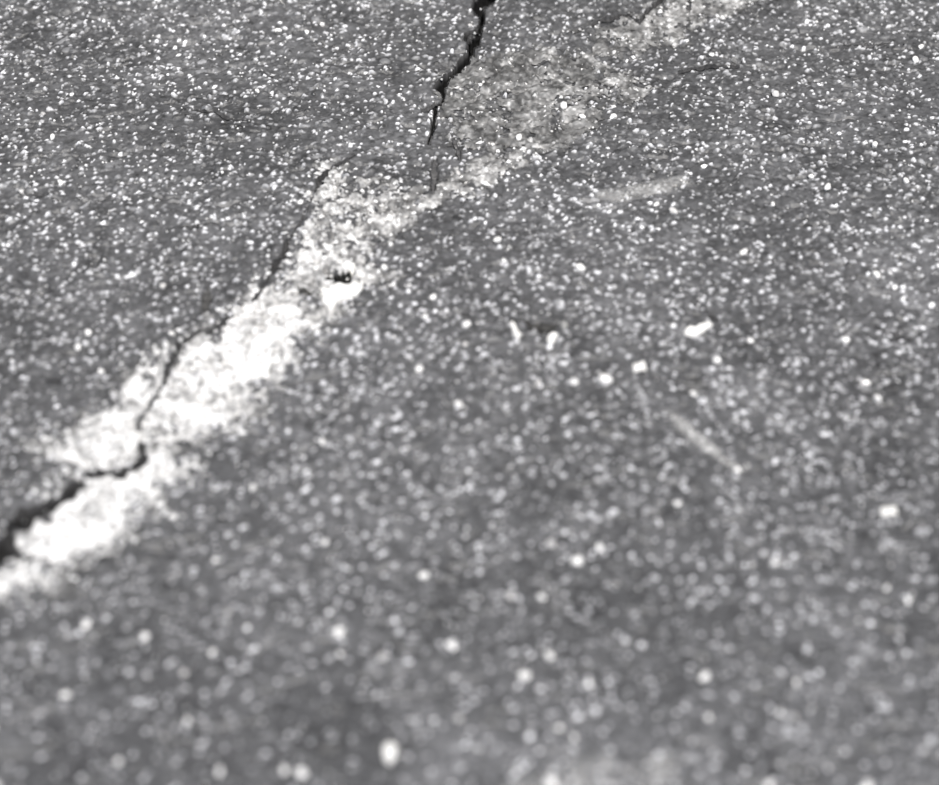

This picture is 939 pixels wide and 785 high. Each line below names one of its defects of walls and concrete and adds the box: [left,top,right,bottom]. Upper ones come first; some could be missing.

crack [193,109,245,122]
crack [422,0,496,194]
crack [0,154,355,565]